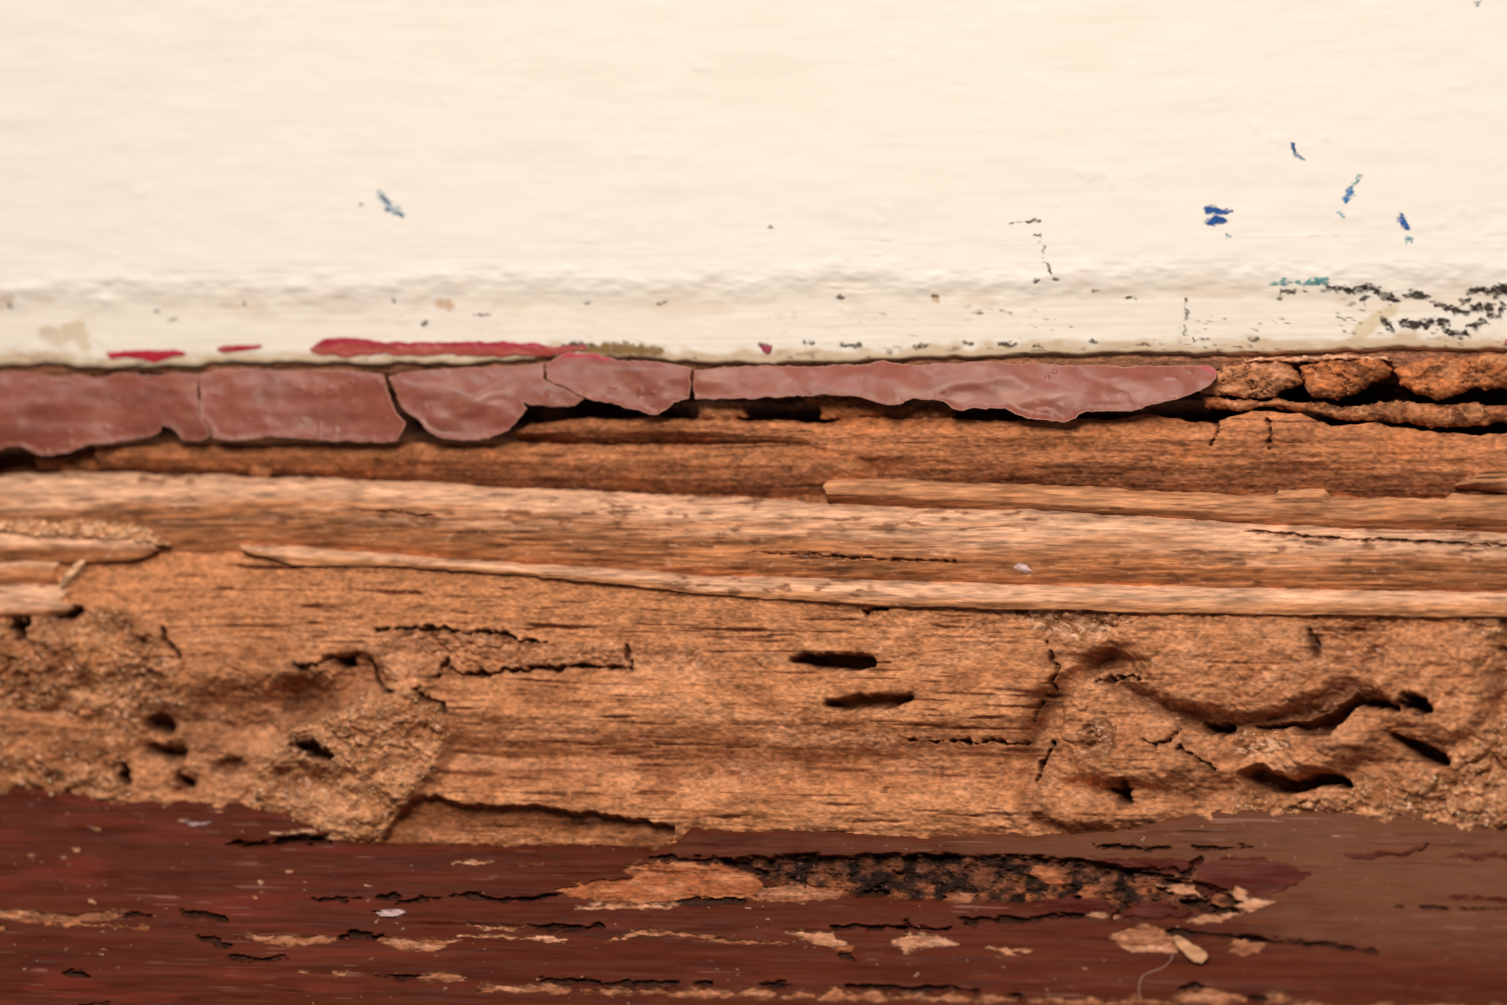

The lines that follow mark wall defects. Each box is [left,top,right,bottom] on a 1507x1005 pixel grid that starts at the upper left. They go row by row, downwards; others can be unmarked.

peeling [0,352,1217,455]
crack [294,625,634,715]
crack [1142,728,1217,771]
peeling [0,909,152,931]
spalling [181,796,1379,975]
peeling [65,969,90,978]